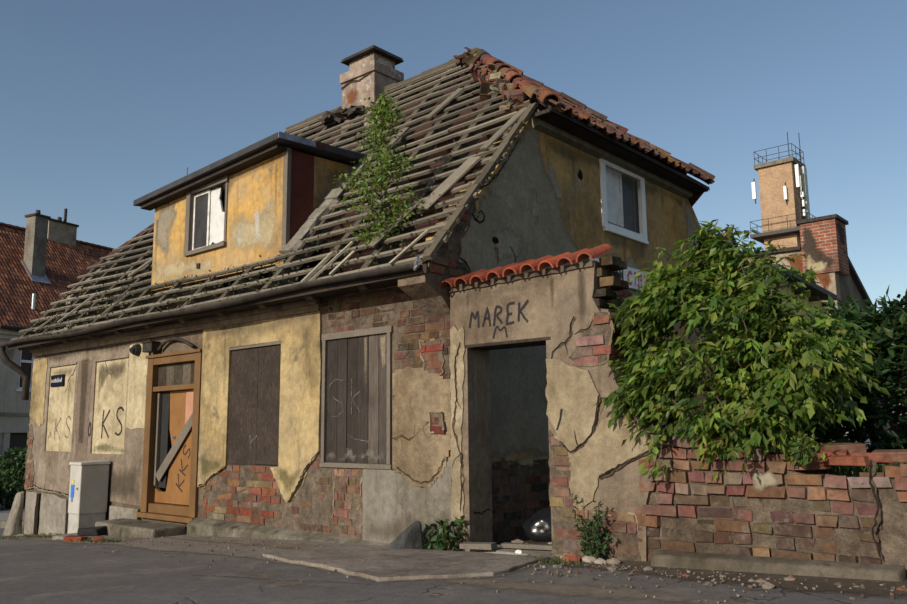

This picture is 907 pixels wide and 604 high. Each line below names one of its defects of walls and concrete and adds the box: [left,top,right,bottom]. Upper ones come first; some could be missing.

flaking render [323,287,451,379]
crack [551,316,591,359]
flaking render [202,465,284,525]
flaking render [329,450,377,535]
spalling [428,411,445,434]
crack [392,342,491,524]
peeling [489,345,641,561]
crack [559,396,601,454]